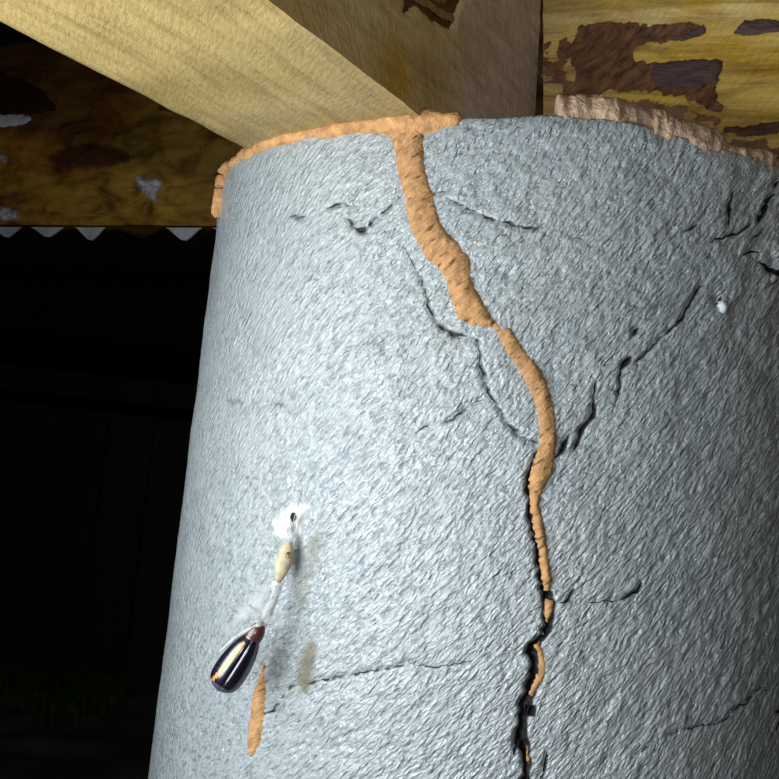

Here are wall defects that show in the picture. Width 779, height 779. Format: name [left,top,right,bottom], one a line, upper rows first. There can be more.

crack [327,196,402,233]
crack [437,191,545,230]
crack [708,181,779,287]
crack [617,285,704,396]
crack [403,246,641,779]
crack [266,661,470,714]